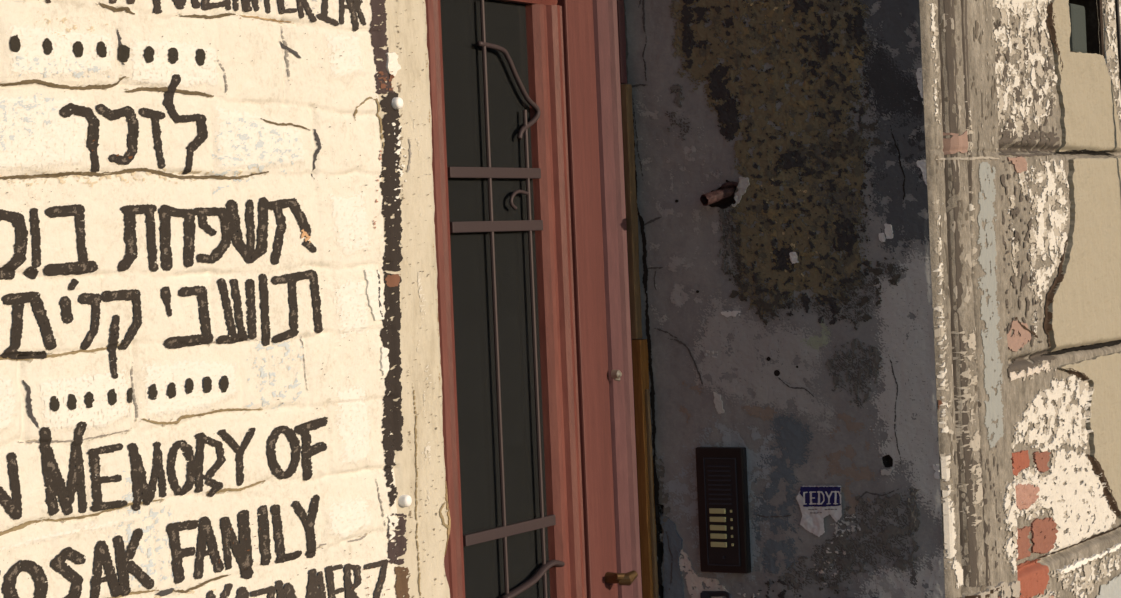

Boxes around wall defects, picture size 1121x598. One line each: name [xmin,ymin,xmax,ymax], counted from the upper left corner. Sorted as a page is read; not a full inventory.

peeling [1103,0,1121,121]
peeling [932,203,949,433]
crack [857,354,902,500]
peeling [933,454,963,589]
peeling [1002,361,1121,598]